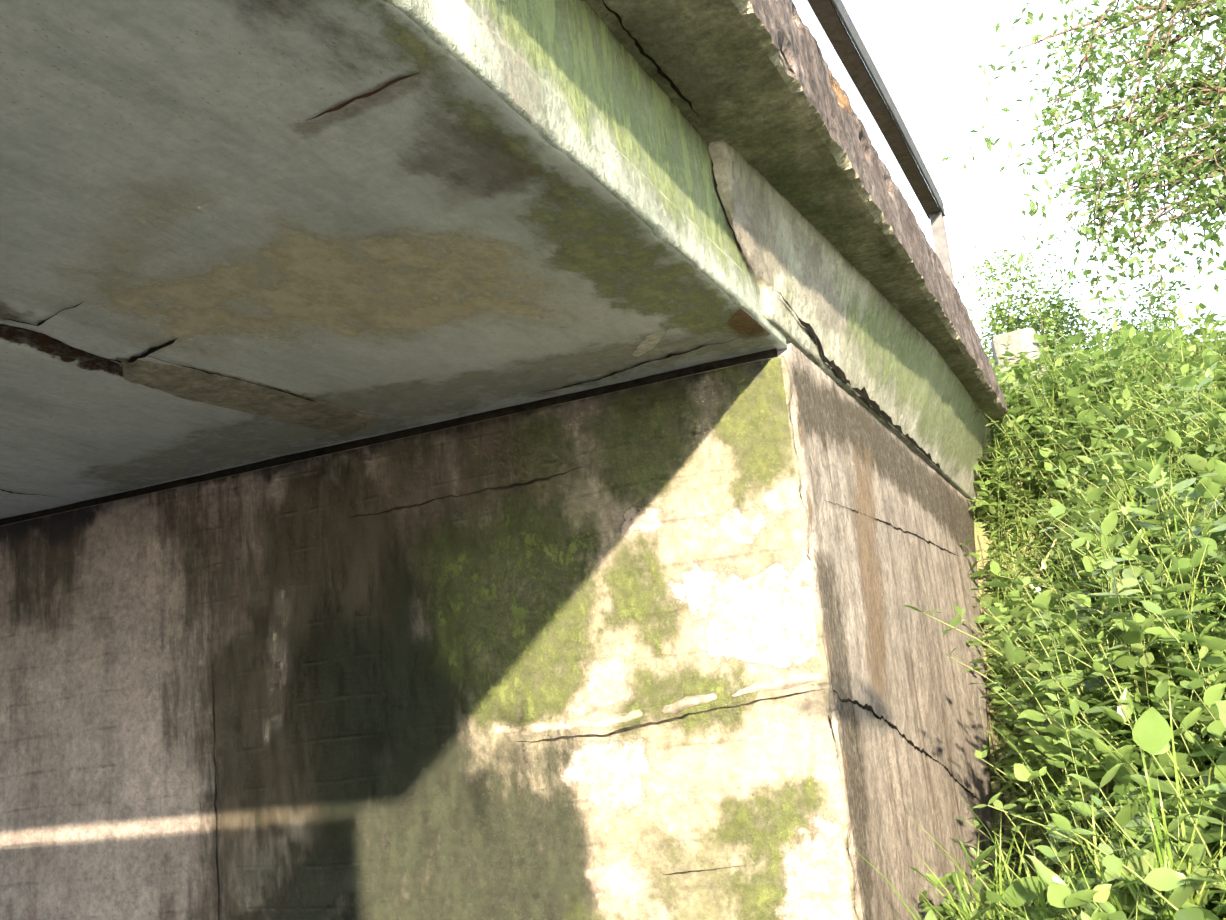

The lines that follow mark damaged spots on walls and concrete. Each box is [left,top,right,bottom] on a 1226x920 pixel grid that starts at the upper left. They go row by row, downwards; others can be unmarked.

crack [602,0,953,481]
water stain [102,230,553,340]
corrosion [727,309,770,339]
crack [538,338,739,393]
peeling [620,501,668,534]
peeling [701,479,813,545]
crack [826,501,959,556]
water stain [0,335,770,920]
peeling [668,548,831,669]
peeling [558,655,634,716]
peeling [560,736,653,811]
crack [517,681,980,801]